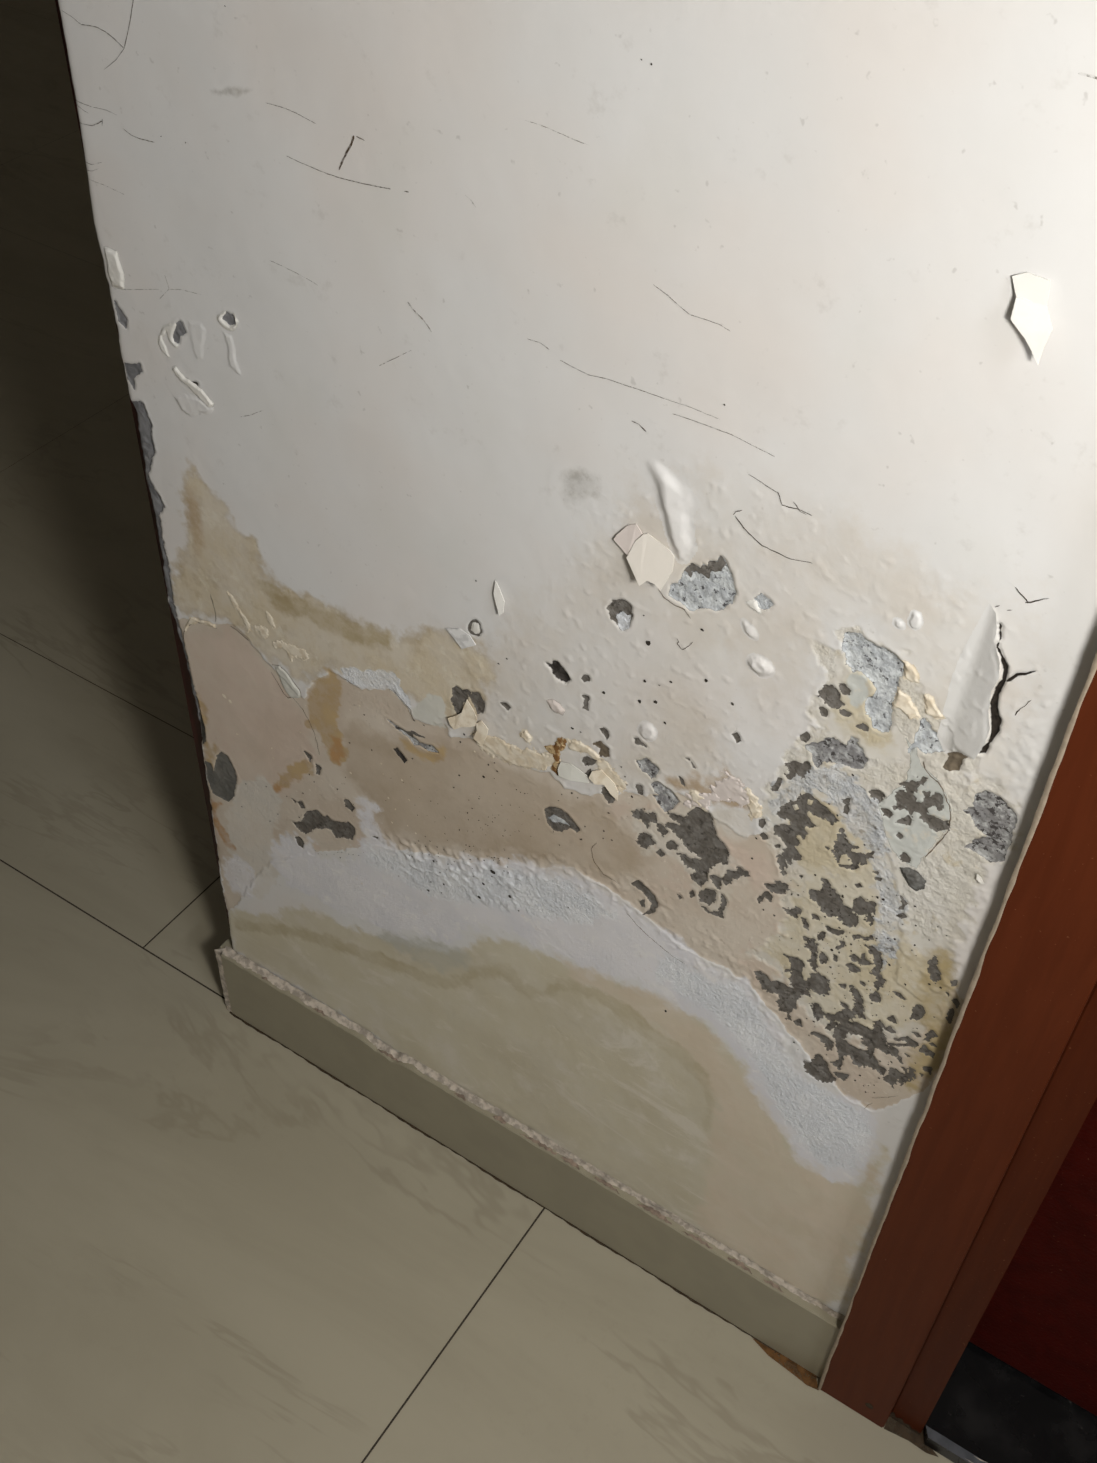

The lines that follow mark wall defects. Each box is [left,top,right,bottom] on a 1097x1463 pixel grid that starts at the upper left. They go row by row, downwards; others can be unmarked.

peeling [114,300,127,328]
peeling [158,321,186,359]
peeling [216,310,239,331]
peeling [1011,272,1052,365]
crack [980,587,1049,753]
flaking render [124,362,1031,1111]
leakage [164,390,1097,1312]